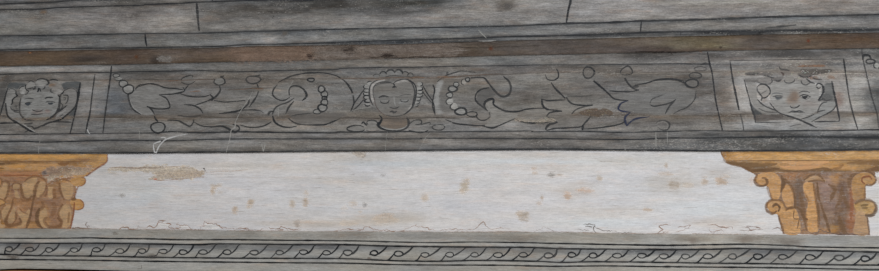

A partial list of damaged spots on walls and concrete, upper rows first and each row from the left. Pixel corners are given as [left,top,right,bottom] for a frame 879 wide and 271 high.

peeling [108,164,206,181]